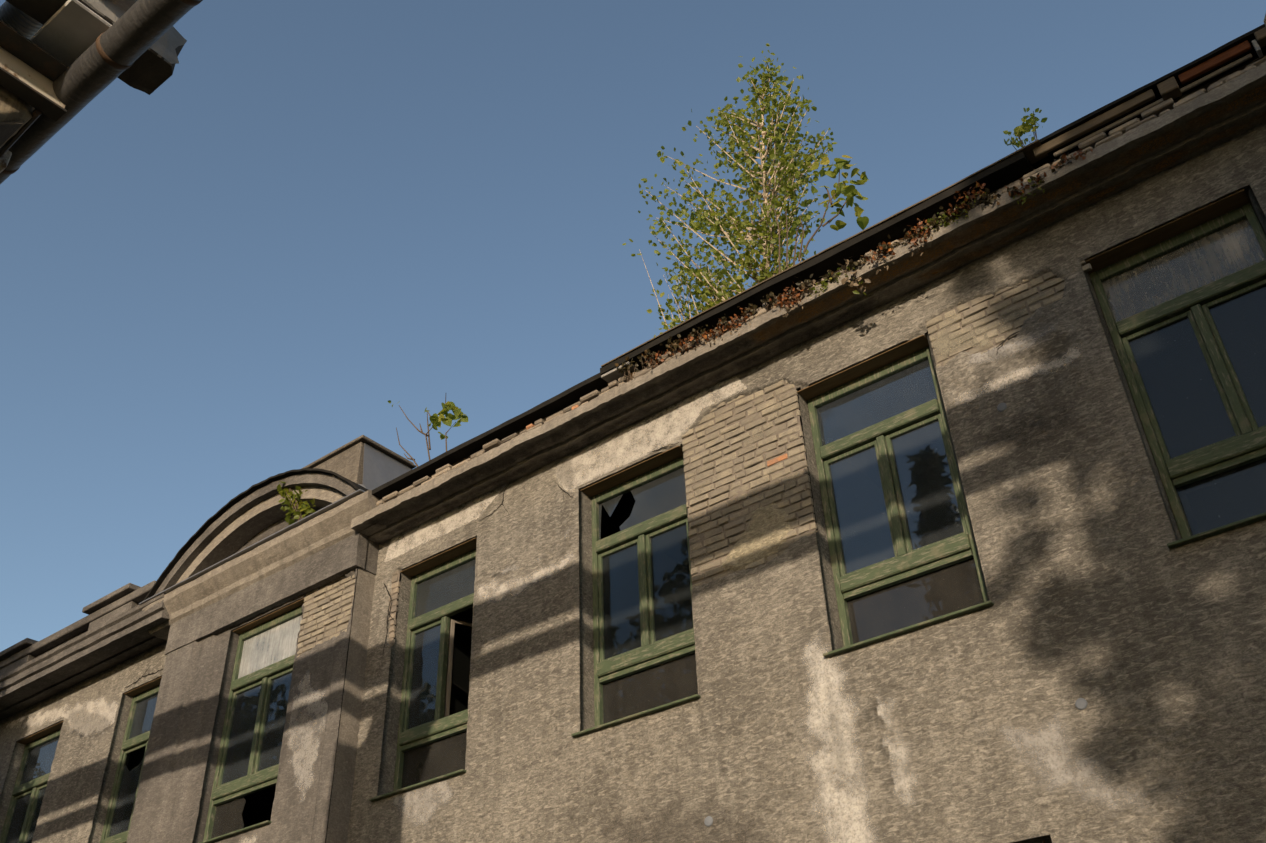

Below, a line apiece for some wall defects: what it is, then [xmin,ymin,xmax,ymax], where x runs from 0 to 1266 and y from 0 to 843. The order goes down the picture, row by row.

flaking render [556,377,817,589]
flaking render [297,570,358,657]
leakage [804,644,874,843]
leakage [884,741,912,803]